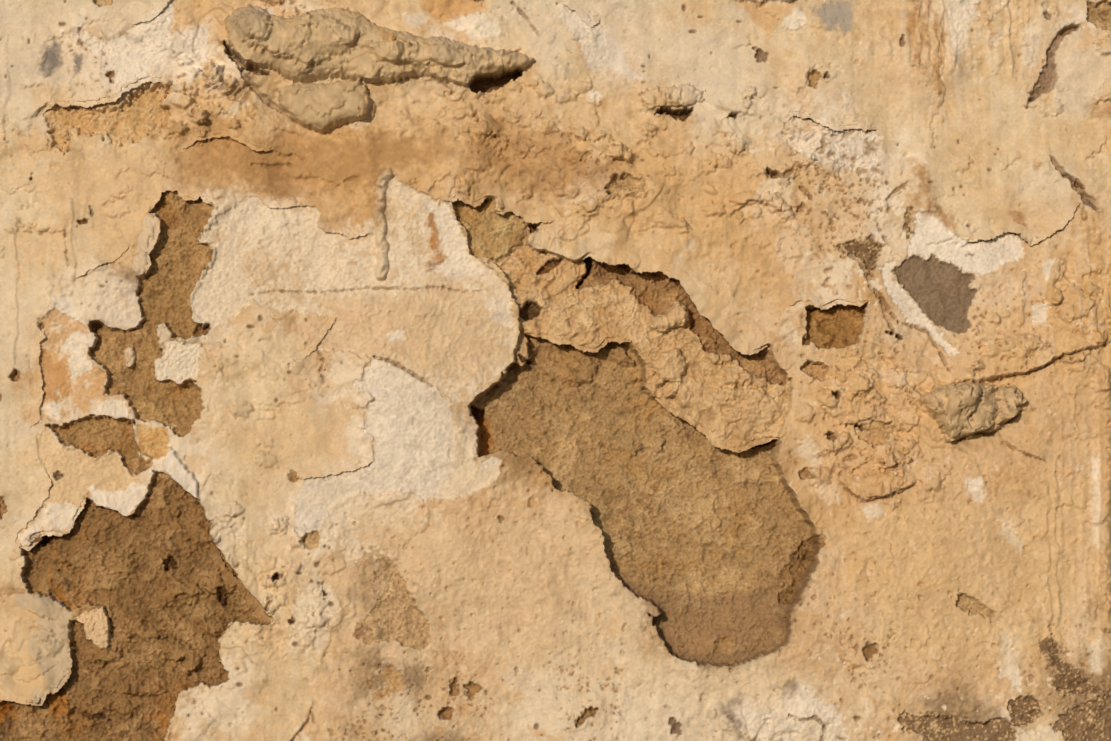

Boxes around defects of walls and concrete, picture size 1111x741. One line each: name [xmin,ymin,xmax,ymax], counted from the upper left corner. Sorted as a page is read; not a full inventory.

crack [1026,23,1083,109]
peeling [834,203,1080,358]
flaking render [0,172,870,741]
flaking render [856,419,894,451]
flaking render [955,591,1002,620]
peeling [860,641,882,662]
flaking render [897,632,1111,741]